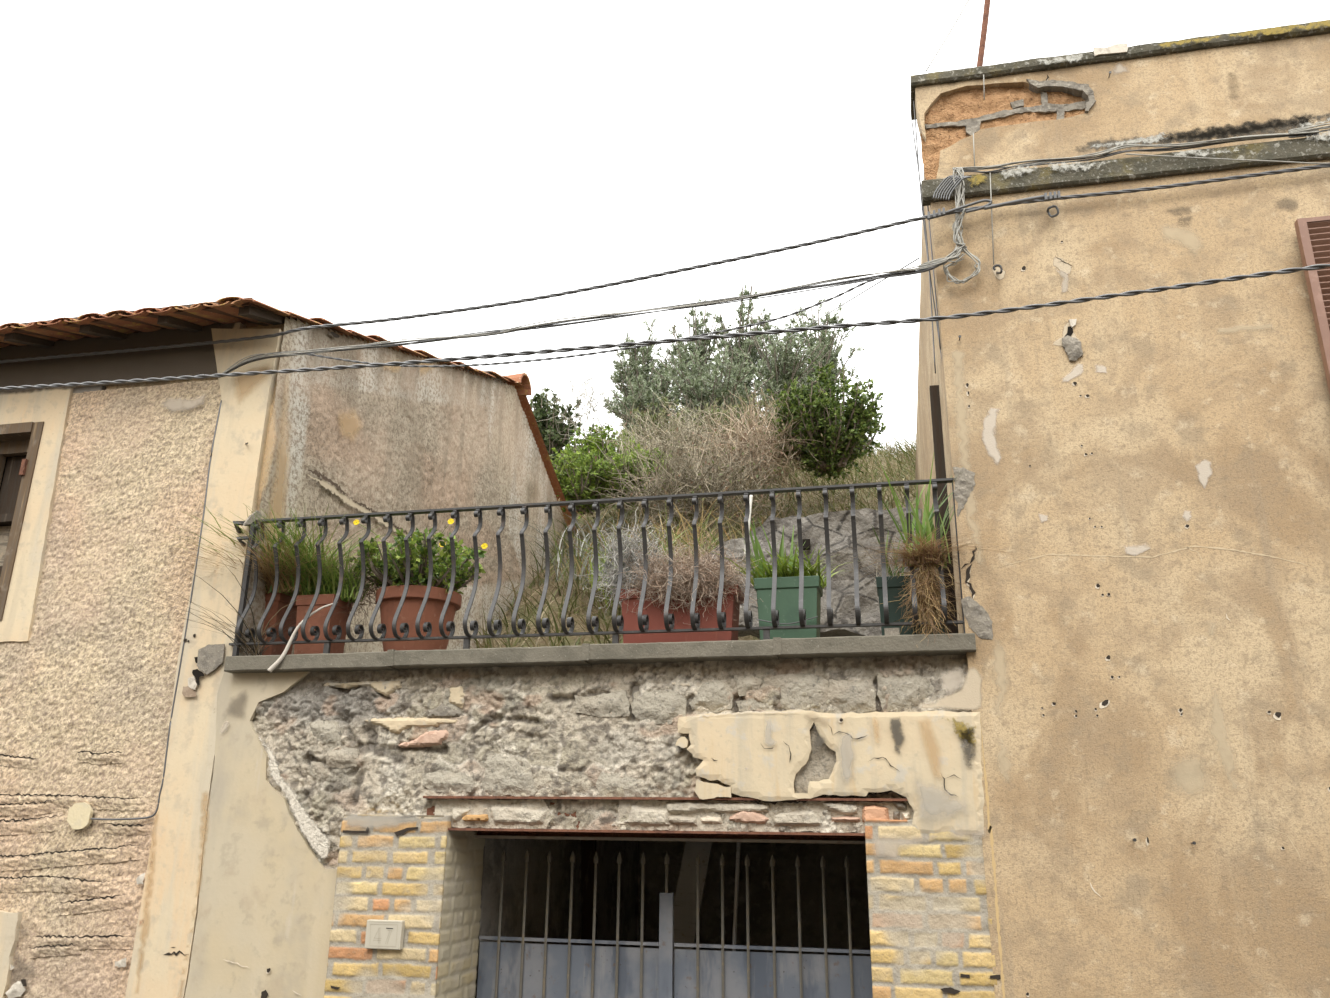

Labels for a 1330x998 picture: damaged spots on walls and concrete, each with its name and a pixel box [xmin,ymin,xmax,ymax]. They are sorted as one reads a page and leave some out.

spalling [921,79,1096,180]
spalling [1053,319,1083,362]
spalling [253,655,984,869]